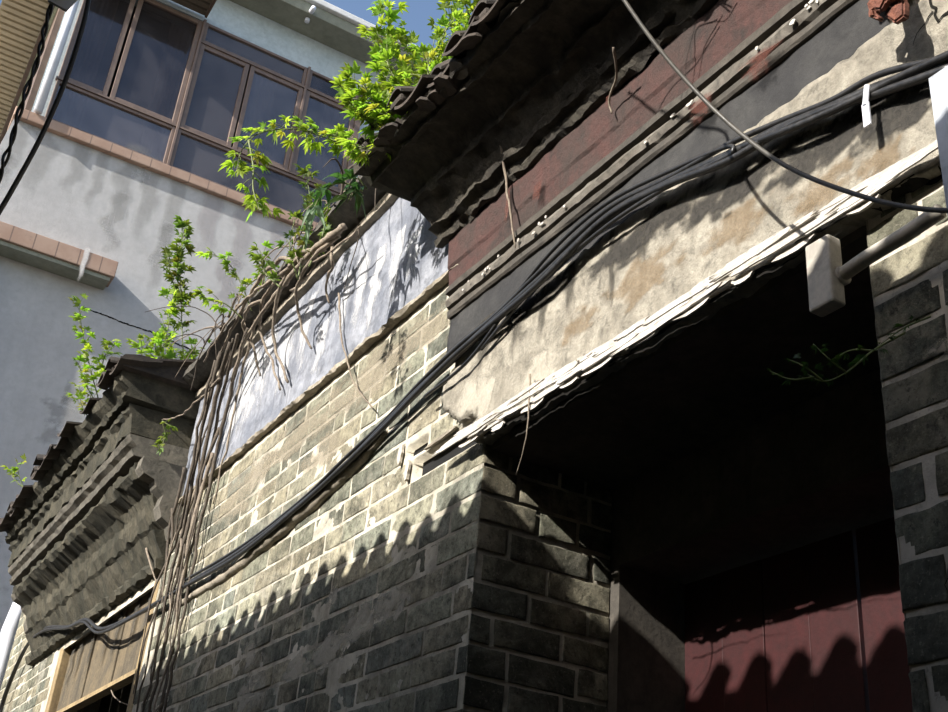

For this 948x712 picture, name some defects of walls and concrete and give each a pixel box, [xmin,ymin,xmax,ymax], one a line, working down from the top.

crack [913,0,948,44]
peeling [397,140,938,482]
leakage [483,81,932,339]